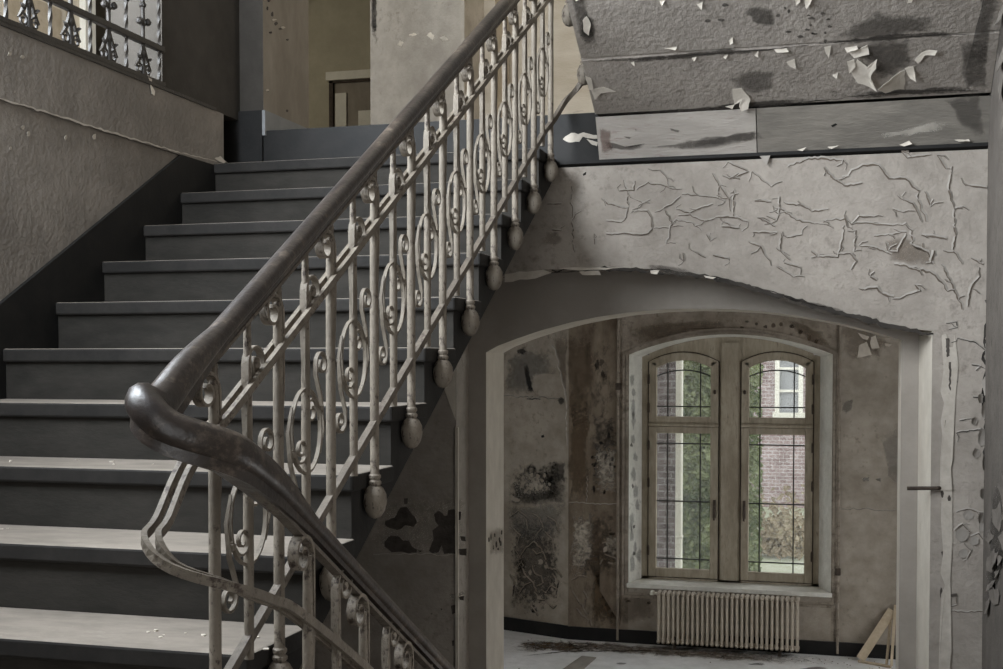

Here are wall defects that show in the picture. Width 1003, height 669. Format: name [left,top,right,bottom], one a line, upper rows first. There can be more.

peeling [574,0,595,41]
peeling [832,42,937,93]
leakage [849,14,924,39]
leakage [963,0,994,85]
peeling [726,88,750,112]
crack [0,98,217,162]
peeling [563,129,640,150]
peeling [666,132,754,148]
crack [547,150,987,442]
leakage [509,408,616,503]
peeling [503,266,958,669]
peeling [384,498,467,555]